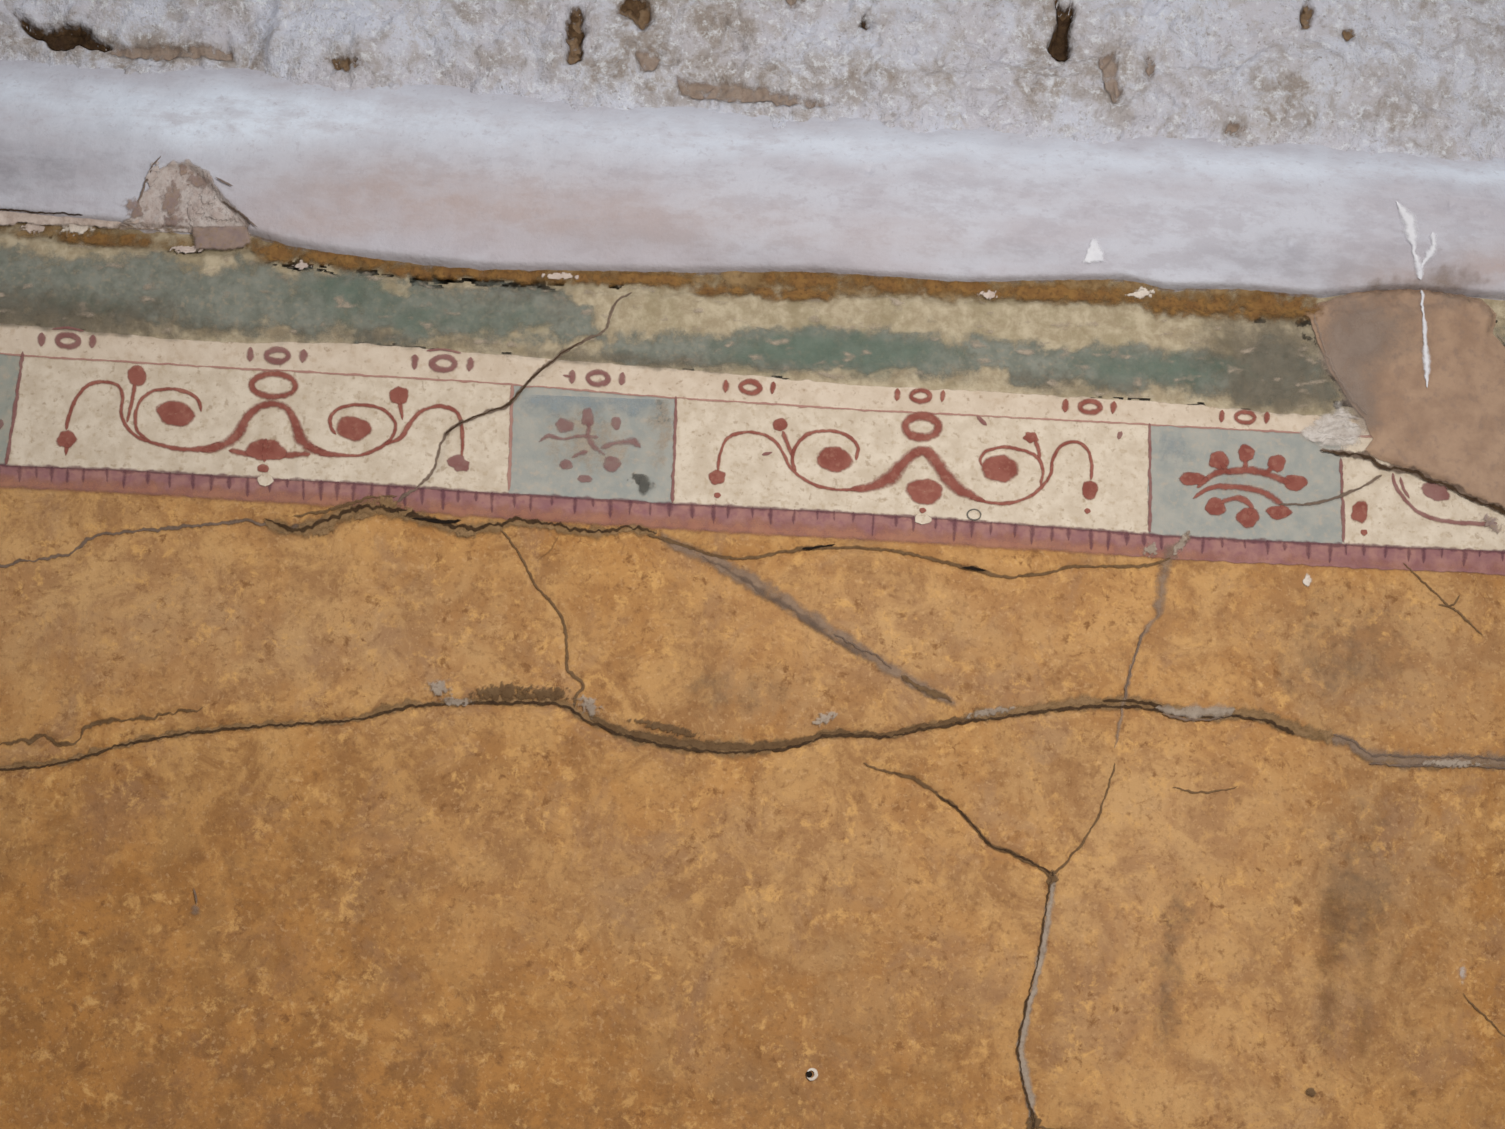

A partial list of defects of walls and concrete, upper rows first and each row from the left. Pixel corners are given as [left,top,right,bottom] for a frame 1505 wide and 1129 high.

spalling [0,156,257,249]
peeling [1301,408,1362,447]
crack [0,292,1505,1129]